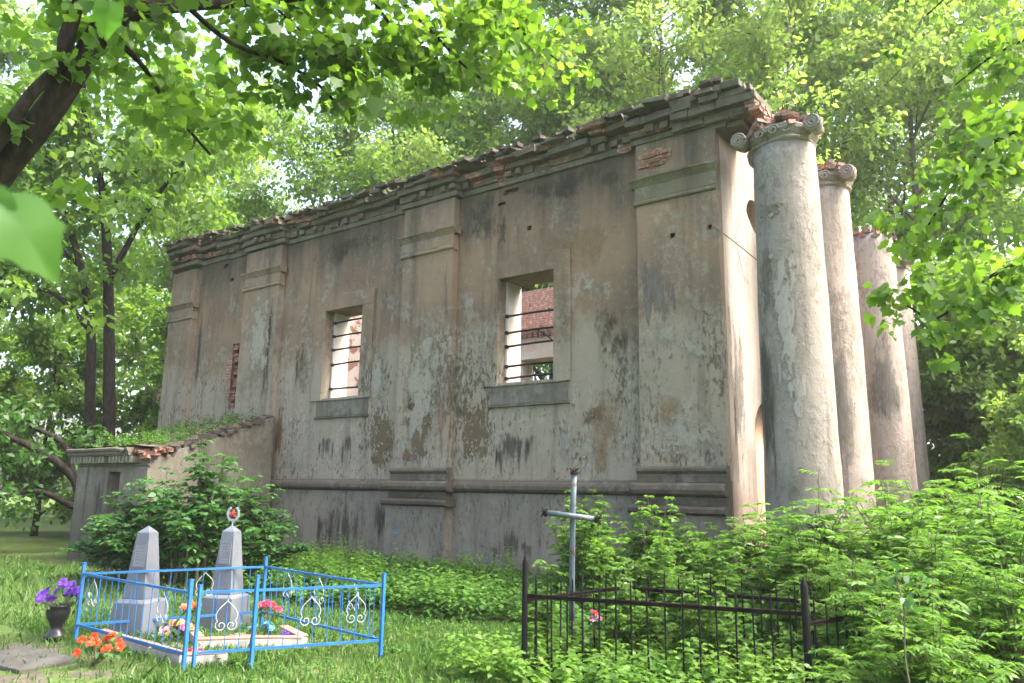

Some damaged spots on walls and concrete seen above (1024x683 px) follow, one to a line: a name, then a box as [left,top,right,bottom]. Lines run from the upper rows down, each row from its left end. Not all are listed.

peeling [367,324,453,479]
leakage [496,434,533,468]
leakage [317,505,357,545]
leakage [375,503,385,535]